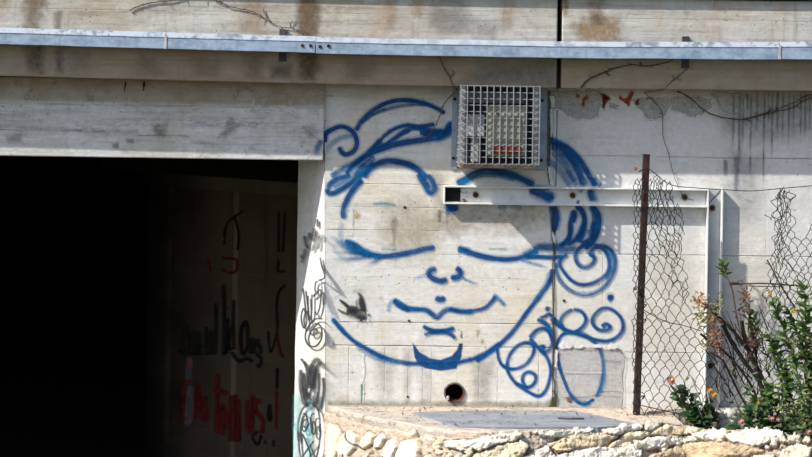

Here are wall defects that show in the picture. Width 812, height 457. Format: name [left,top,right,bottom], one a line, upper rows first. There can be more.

peeling [552,89,620,120]
rust [601,91,639,108]
peeling [633,91,743,121]